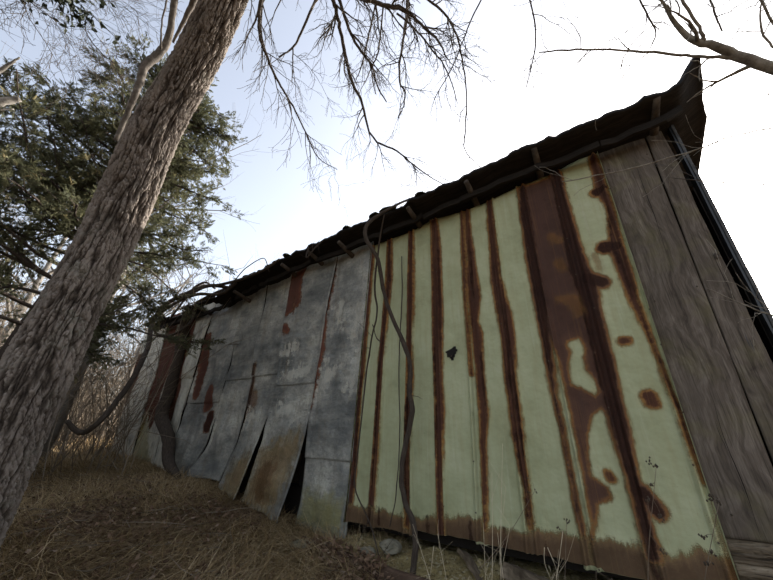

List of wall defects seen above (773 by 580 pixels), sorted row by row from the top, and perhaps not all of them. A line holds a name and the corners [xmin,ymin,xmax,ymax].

corrosion [136,312,197,442]
corrosion [192,332,214,434]
corrosion [282,268,306,335]
corrosion [343,152,738,580]